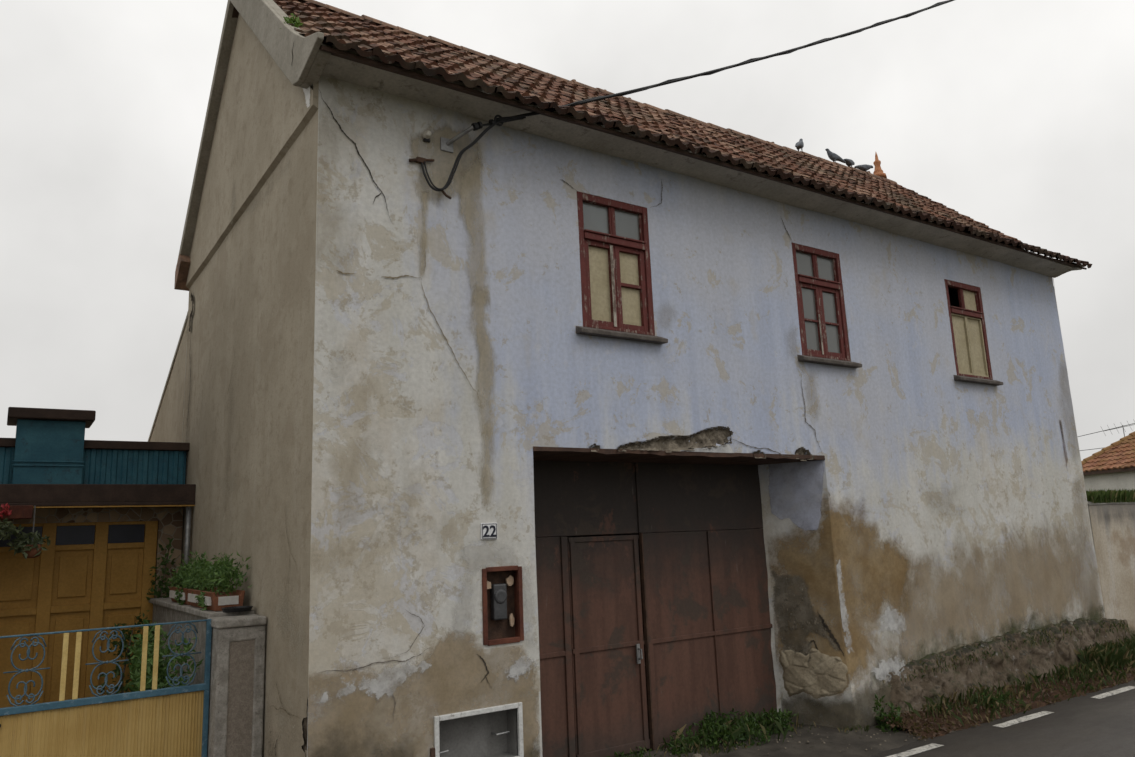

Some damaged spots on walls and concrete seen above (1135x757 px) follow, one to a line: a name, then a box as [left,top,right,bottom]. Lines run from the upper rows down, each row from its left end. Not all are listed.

crack [318,88,390,218]
water stain [411,125,494,406]
crack [382,255,481,402]
water stain [482,420,493,501]
spalling [618,426,734,453]
peeling [753,447,830,530]
crack [316,612,428,721]
peeling [301,632,540,757]
flaking render [772,560,852,661]
water stain [771,498,1101,729]